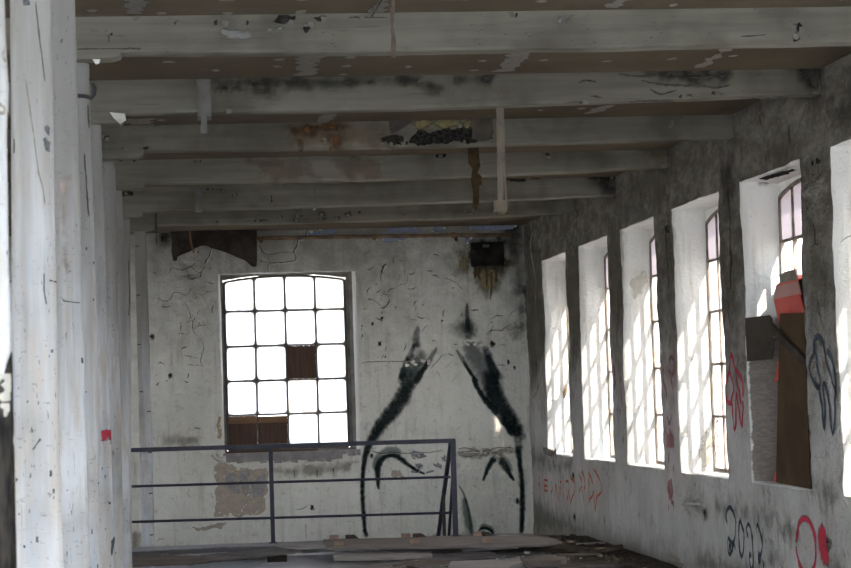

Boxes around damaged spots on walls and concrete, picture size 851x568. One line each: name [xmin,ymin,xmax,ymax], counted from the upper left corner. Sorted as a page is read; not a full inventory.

damp [221,77,372,95]
damp [396,76,443,94]
damp [646,70,731,85]
crack [159,251,213,366]
peeling [192,462,269,531]